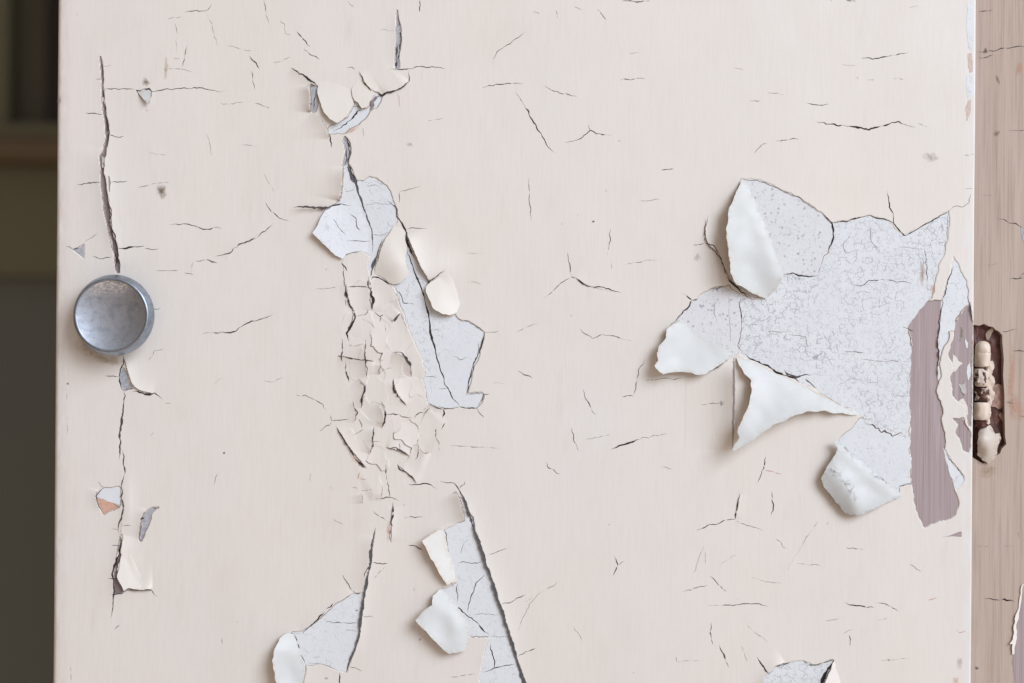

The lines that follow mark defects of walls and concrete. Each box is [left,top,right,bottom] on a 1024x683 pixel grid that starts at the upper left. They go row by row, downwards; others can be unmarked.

crack [102,71,110,171]
peeling [295,67,410,147]
crack [483,35,605,148]
crack [809,103,927,130]
crack [157,174,284,275]
crack [297,261,491,541]
peeling [297,164,498,418]
peeling [655,179,973,527]
peeling [110,507,158,616]
peeling [272,532,387,683]
peeling [409,481,534,683]
crack [676,457,820,668]